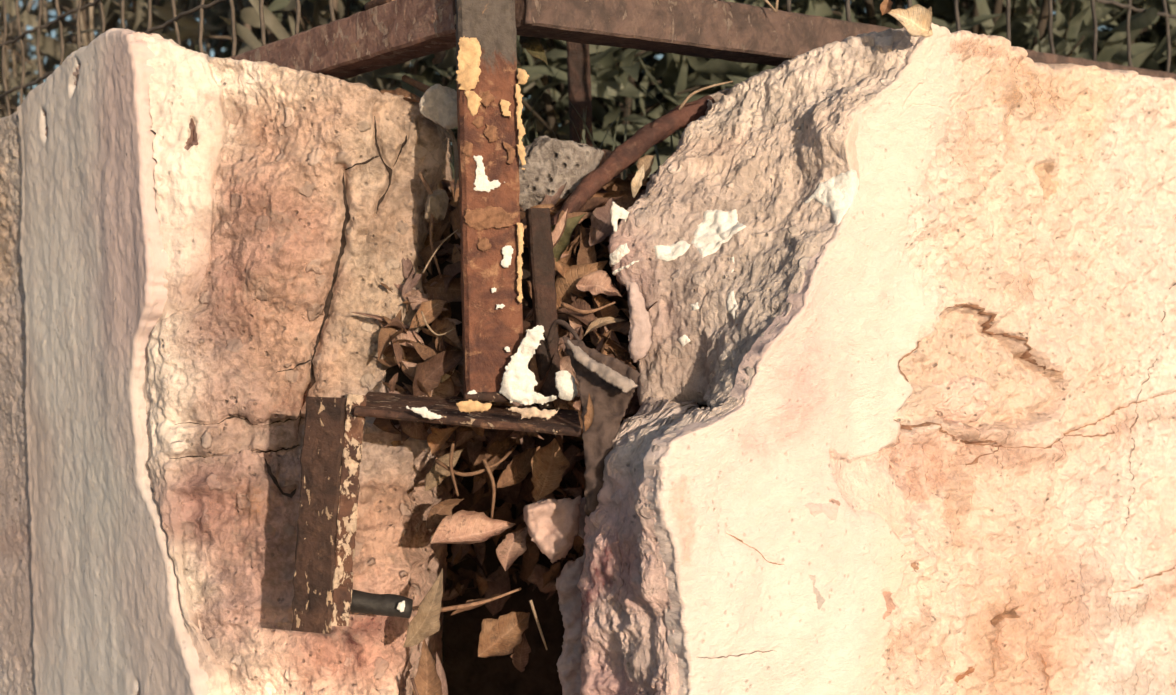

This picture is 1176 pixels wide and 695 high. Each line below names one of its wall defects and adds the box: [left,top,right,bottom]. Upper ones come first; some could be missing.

crack [175,116,407,498]
spalling [577,28,919,695]
flaking render [804,307,1067,539]
crack [965,283,1176,526]
spalling [954,667,975,686]